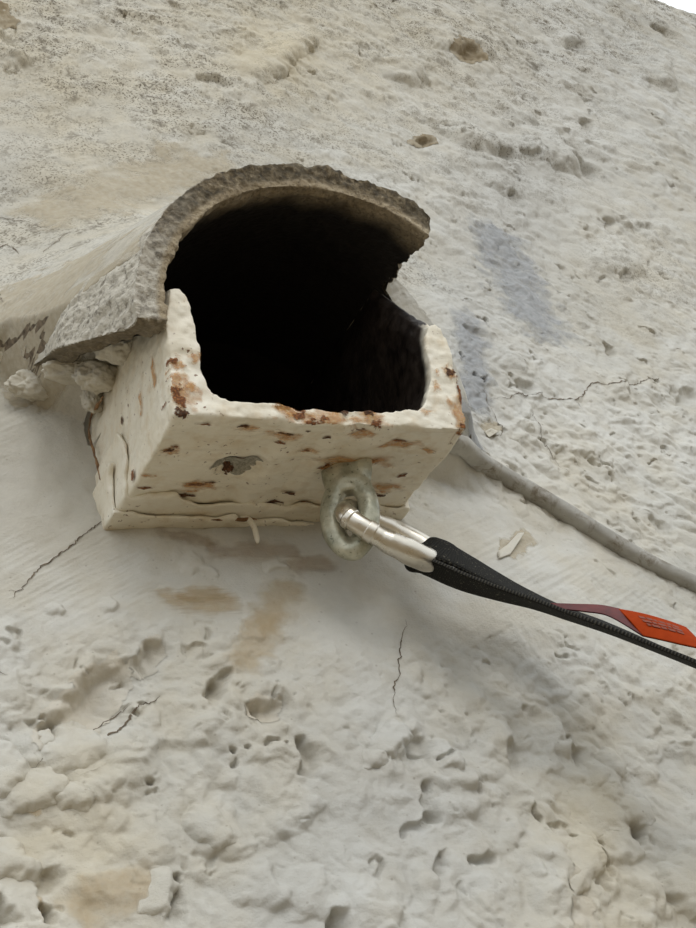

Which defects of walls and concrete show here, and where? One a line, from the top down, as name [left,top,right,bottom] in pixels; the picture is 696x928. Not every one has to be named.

spalling [0,1,21,29]
peeling [0,230,132,409]
rust [151,354,201,420]
rust [237,403,382,445]
crack [483,378,659,469]
rust [372,439,413,467]
rust [179,482,217,497]
rust [375,473,408,497]
crack [9,521,102,597]